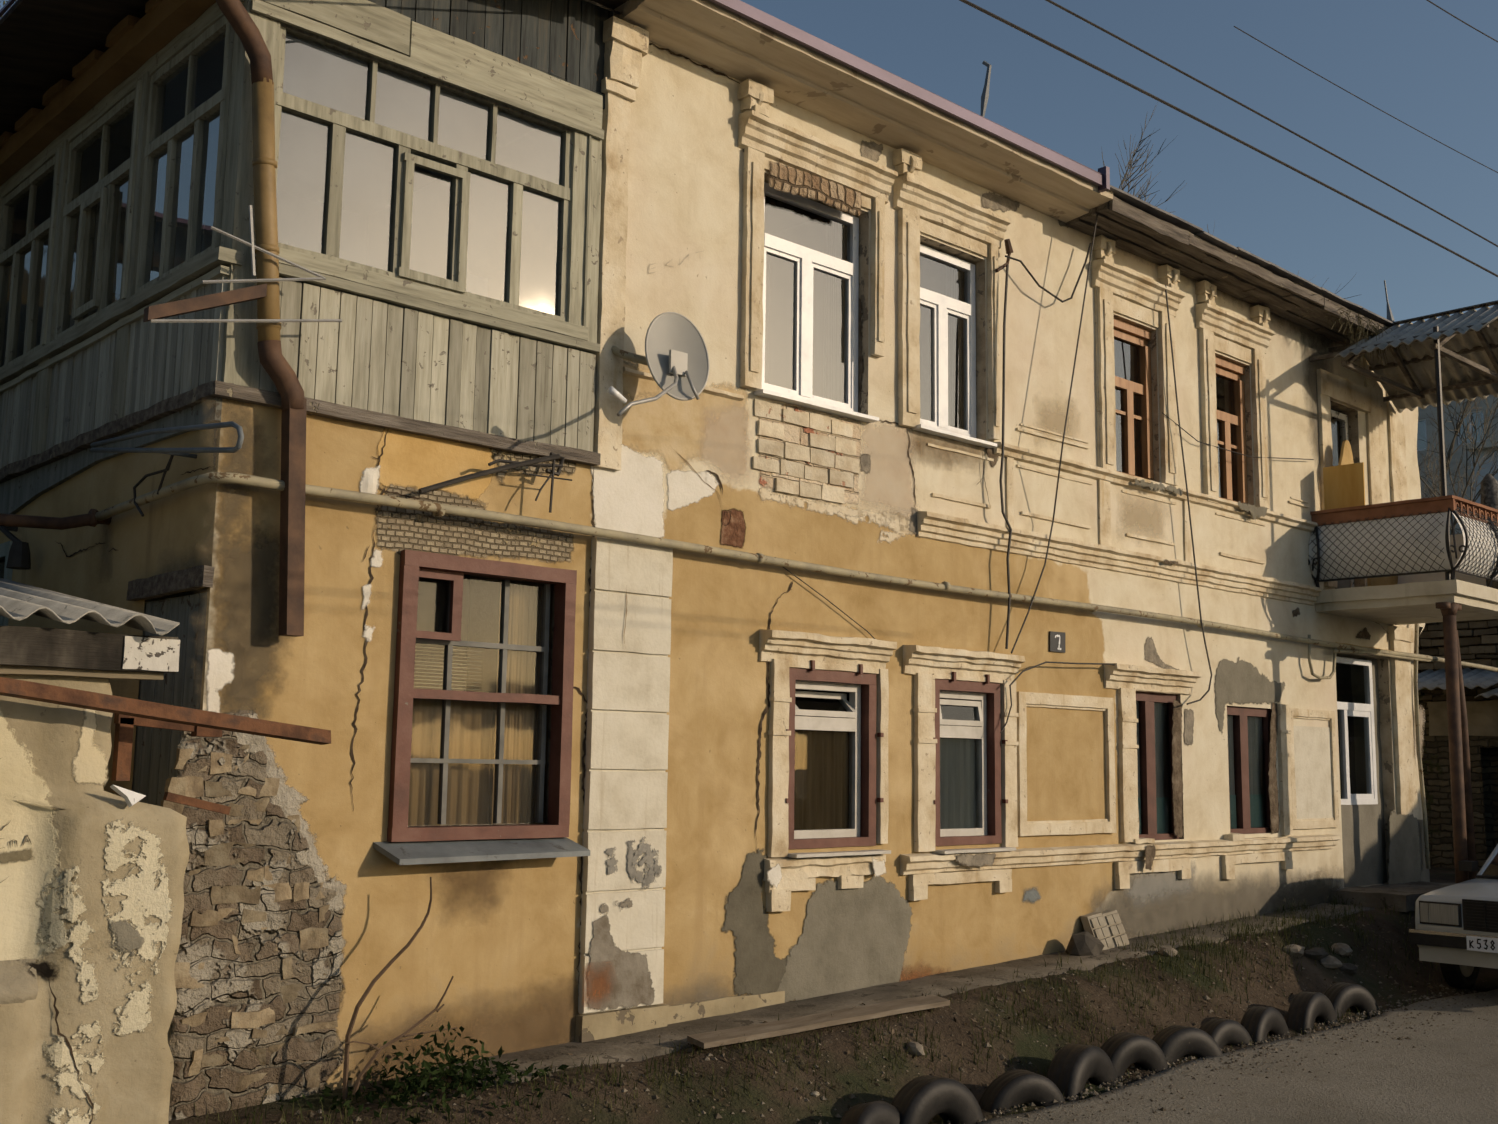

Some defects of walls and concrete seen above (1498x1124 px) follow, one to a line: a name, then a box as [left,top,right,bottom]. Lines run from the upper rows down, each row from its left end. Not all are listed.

flaking render [622,297,918,542]
crack [350,431,433,810]
flaking render [36,709,347,1124]
peeling [587,837,662,1011]
flaking render [768,864,782,887]
flaking render [873,858,886,876]